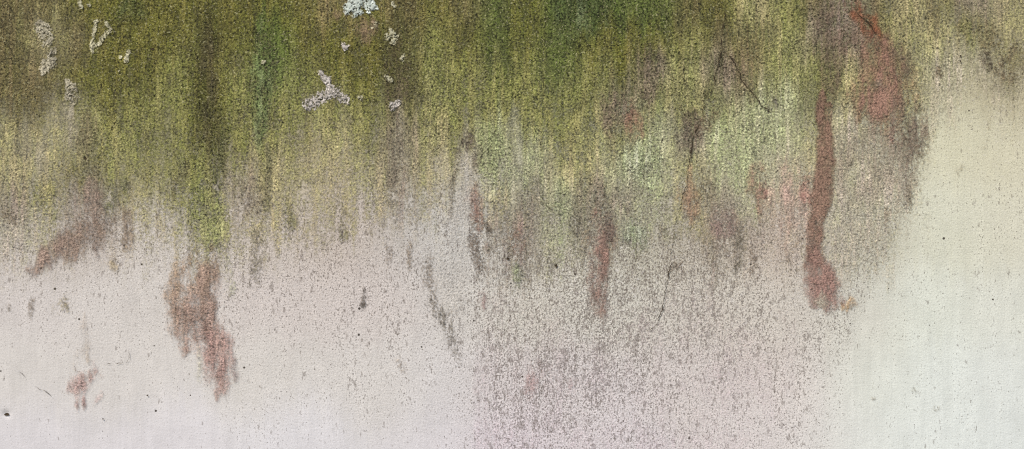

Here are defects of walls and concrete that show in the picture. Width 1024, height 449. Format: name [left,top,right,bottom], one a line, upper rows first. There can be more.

water stain [173,15,229,250]
water stain [429,109,524,273]
water stain [623,143,661,190]
crack [649,10,768,330]
corrosion [750,5,927,311]
corrosion [164,262,236,399]